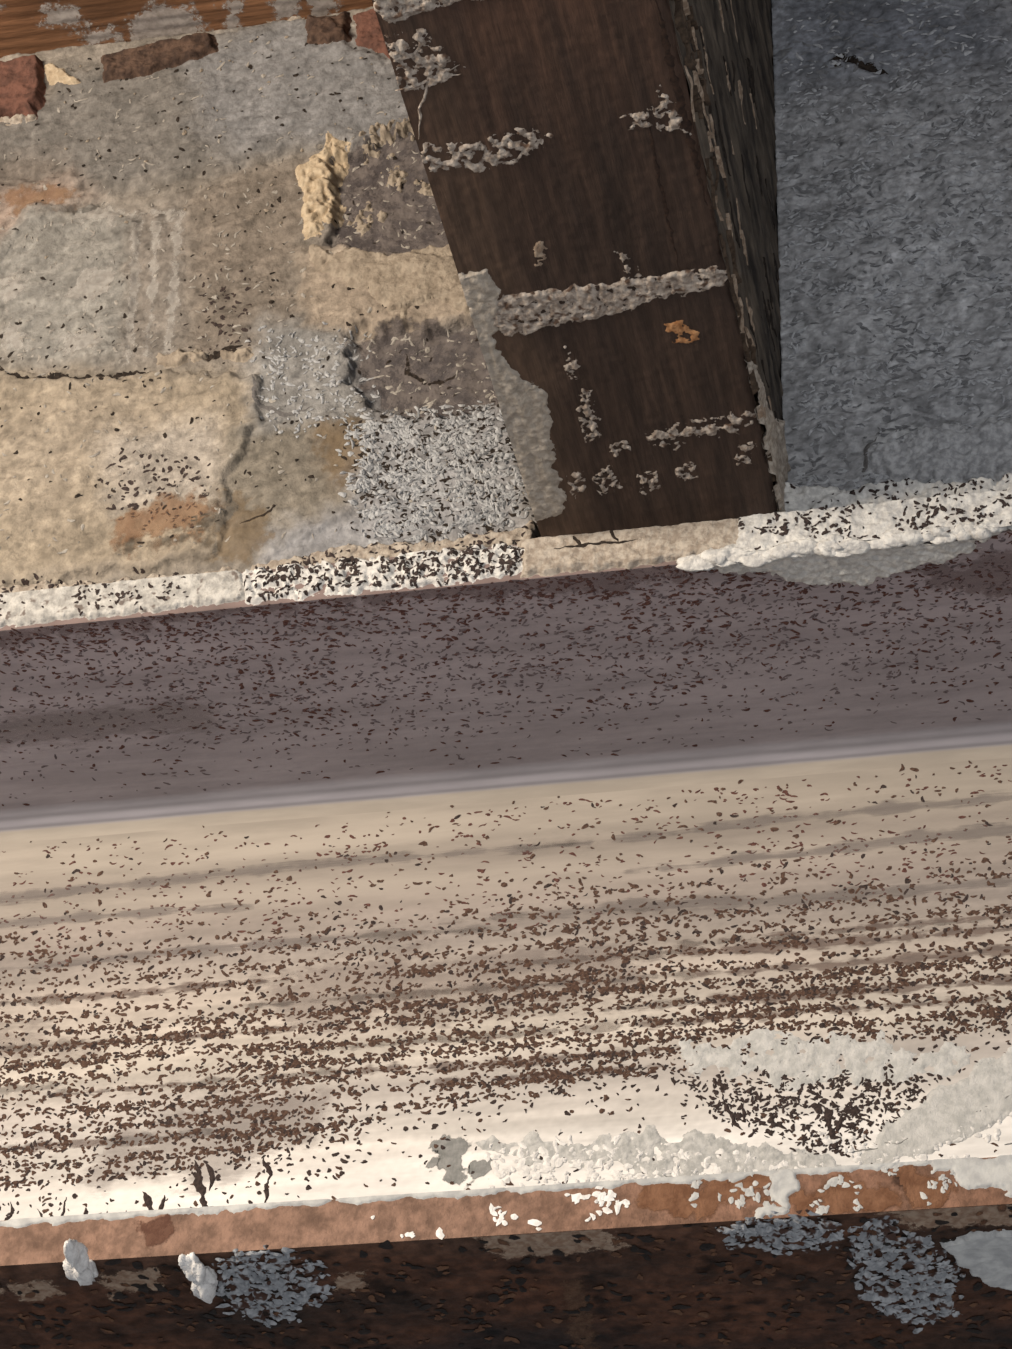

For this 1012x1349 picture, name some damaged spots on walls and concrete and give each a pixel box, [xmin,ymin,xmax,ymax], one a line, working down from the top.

flaking render [0,32,228,153]
crack [0,366,149,379]
spalling [40,287,115,390]